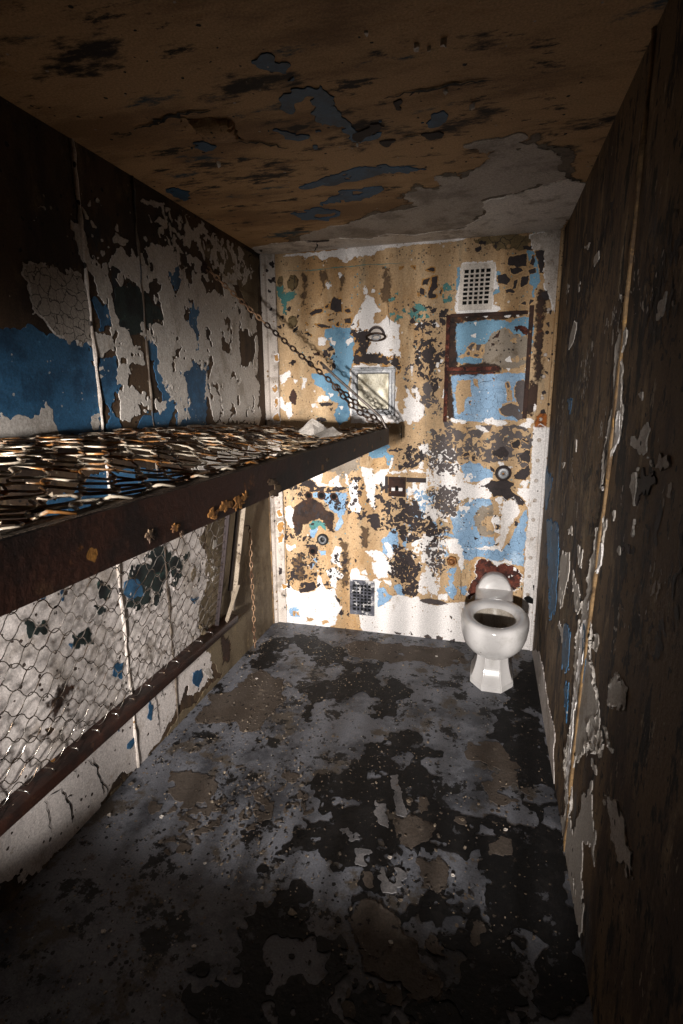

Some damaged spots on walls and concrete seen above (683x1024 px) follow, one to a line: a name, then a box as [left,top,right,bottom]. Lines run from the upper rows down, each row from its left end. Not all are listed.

peeling [251,52,396,150]
peeling [421,110,448,140]
rust [444,310,522,420]
peeling [557,250,675,555]
spalling [0,132,616,1024]
peeling [607,672,628,711]
peeling [602,795,634,880]